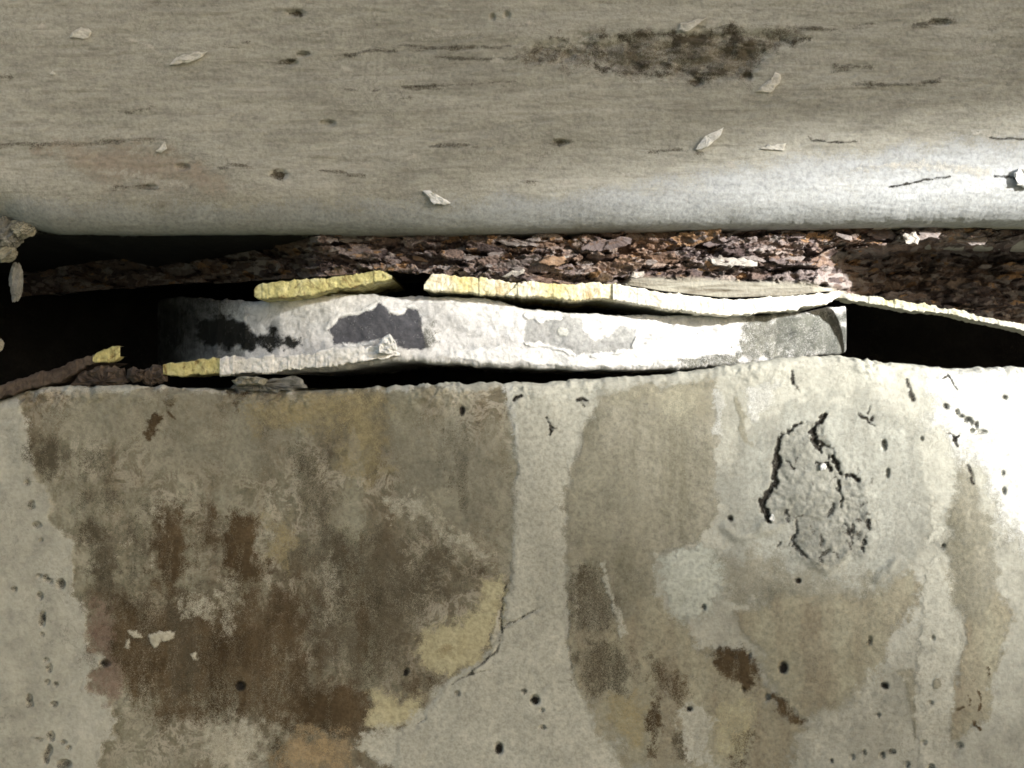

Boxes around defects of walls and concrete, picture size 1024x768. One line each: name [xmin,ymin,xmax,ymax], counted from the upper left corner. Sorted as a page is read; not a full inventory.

damp [334,17,941,100]
rust [464,237,576,278]
rust [581,237,632,252]
rust [611,259,658,278]
rust [703,231,805,274]
rust [836,229,988,257]
crack [859,405,875,427]
damp [4,296,1024,768]